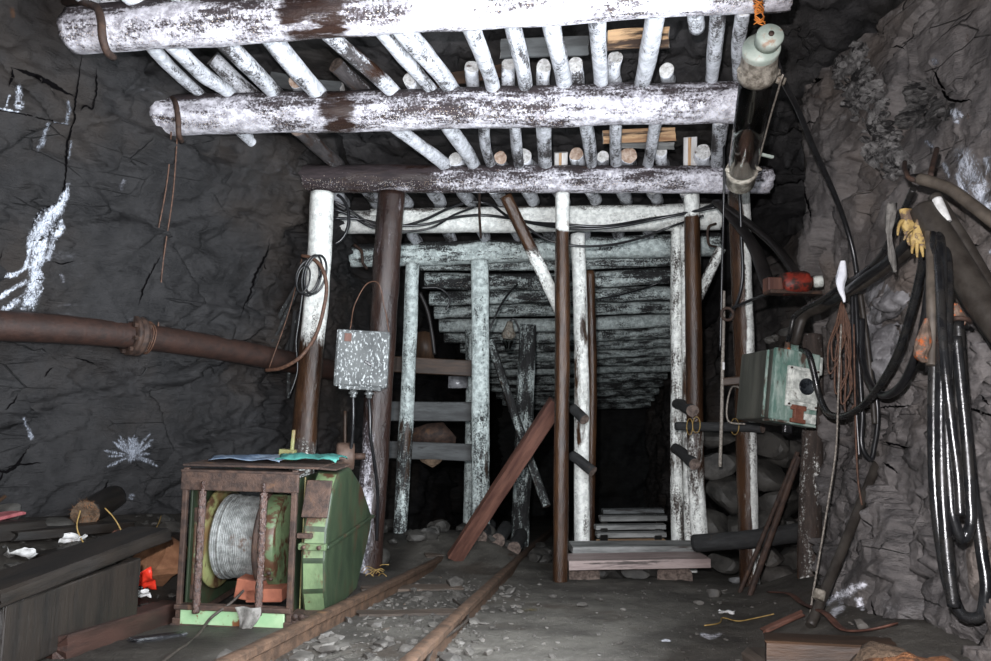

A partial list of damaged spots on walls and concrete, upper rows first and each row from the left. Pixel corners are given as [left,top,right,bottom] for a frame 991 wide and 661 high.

damp [0,188,69,311]